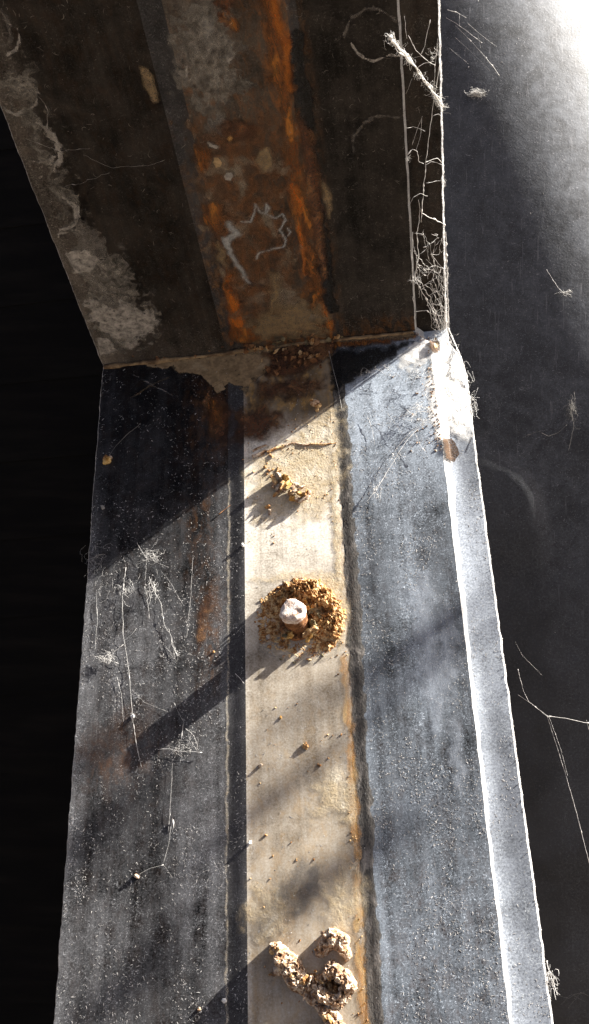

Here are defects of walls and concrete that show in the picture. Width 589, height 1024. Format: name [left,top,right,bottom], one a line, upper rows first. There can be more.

damp [0,64,161,355]
rust [167,0,418,446]
peeling [146,350,271,394]